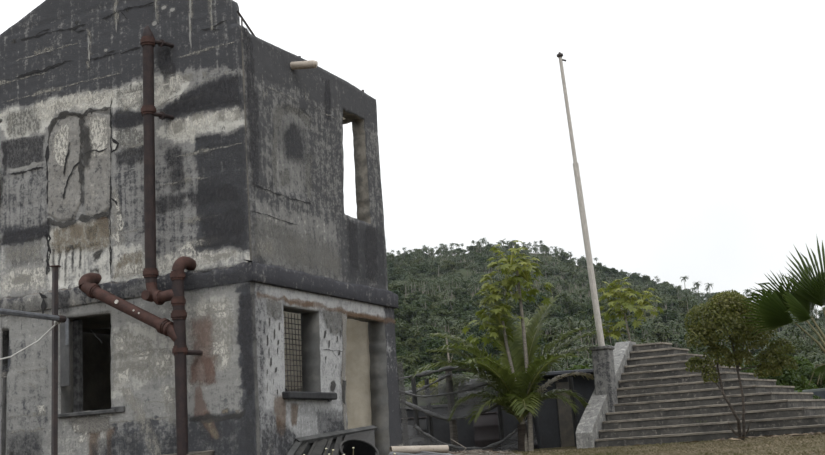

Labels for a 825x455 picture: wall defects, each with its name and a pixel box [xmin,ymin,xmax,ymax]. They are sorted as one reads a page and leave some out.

water stain [113,111,143,130]
water stain [166,27,267,187]
water stain [2,136,44,175]
water stain [115,145,144,164]
water stain [156,146,239,213]
crack [39,91,119,314]
water stain [3,222,50,267]